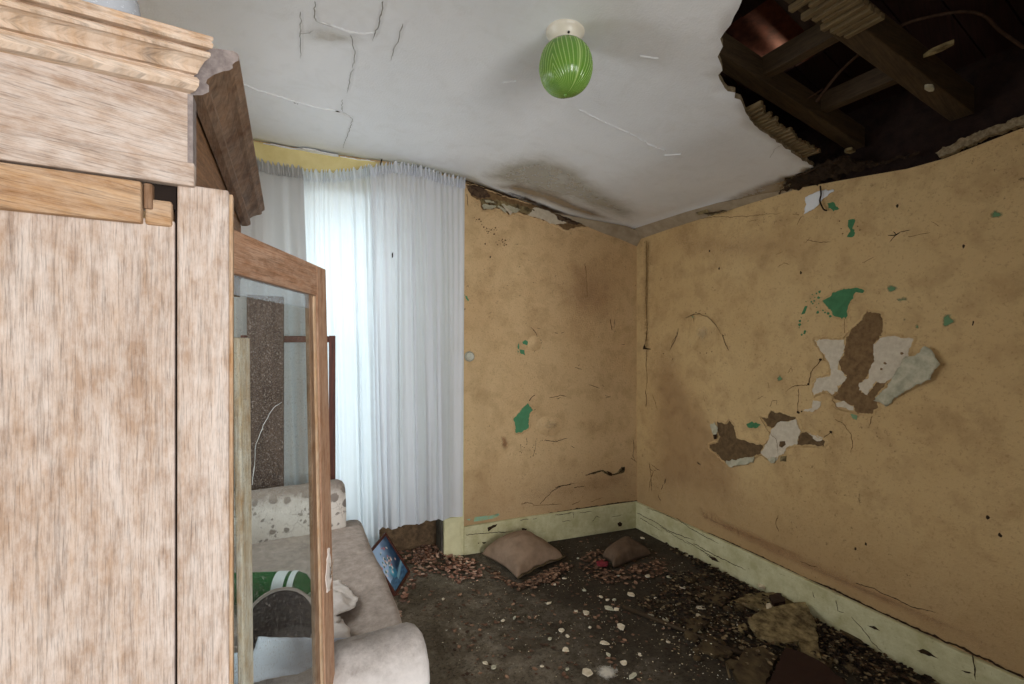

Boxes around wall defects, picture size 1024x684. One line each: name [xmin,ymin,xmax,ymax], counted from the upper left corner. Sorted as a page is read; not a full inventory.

crack [299,2,403,147]
flaking render [936,115,1024,159]
flaking render [465,180,589,232]
water stain [466,182,596,215]
peeling [804,189,860,237]
flaking render [708,285,940,468]
peeling [511,402,535,434]
crack [468,441,743,569]